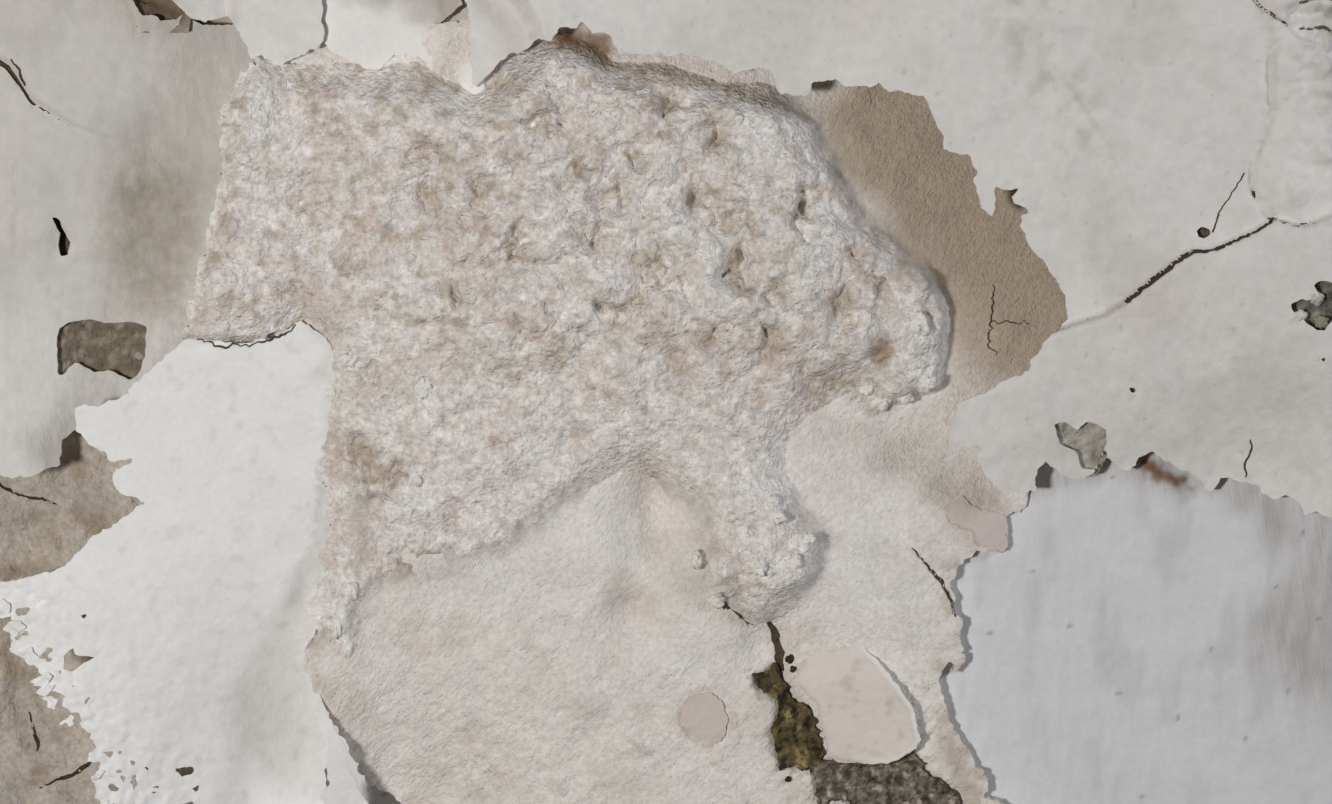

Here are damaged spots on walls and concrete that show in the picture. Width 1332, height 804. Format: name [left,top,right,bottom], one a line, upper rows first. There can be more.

crack [0,59,60,120]
peeling [286,0,487,94]
crack [1253,0,1288,26]
crack [1124,173,1316,303]
flaking render [302,22,1332,804]
peeling [3,620,26,635]
peeling [30,673,58,709]
damp [752,654,960,804]